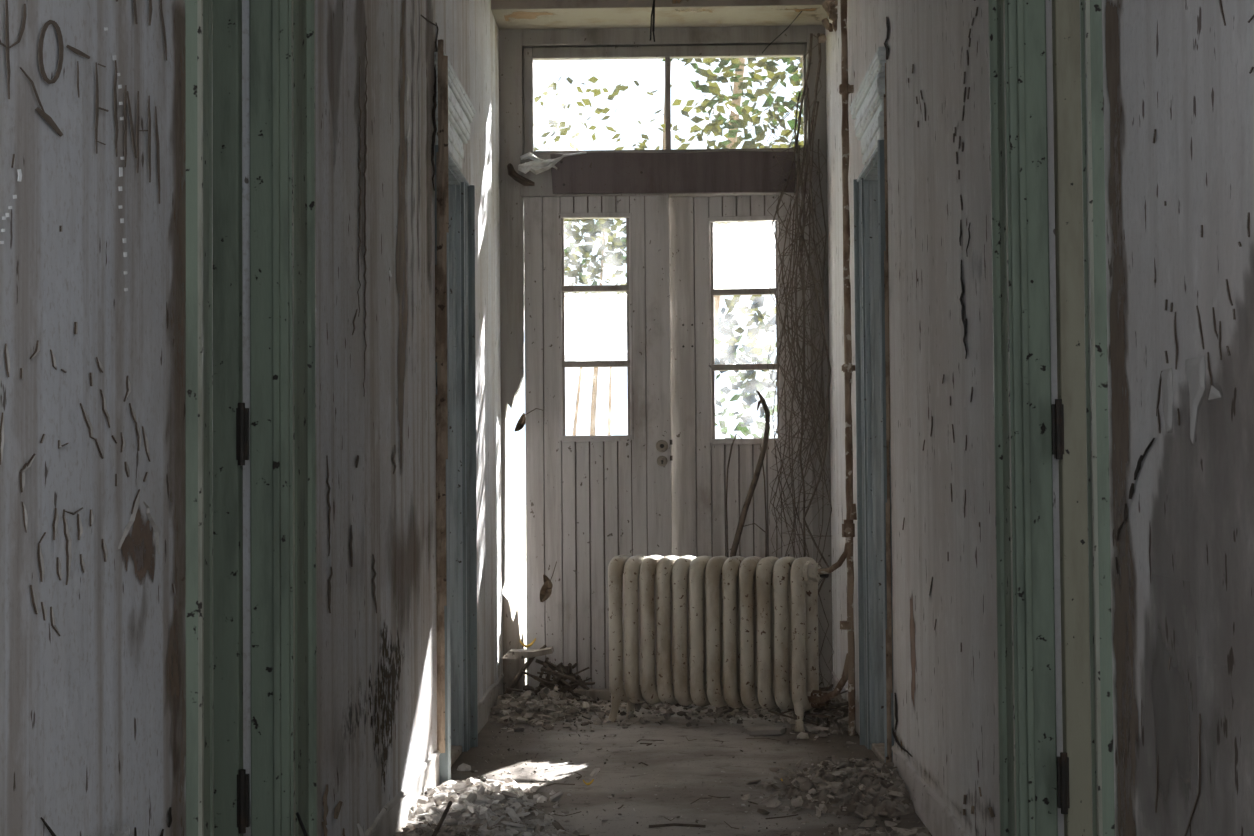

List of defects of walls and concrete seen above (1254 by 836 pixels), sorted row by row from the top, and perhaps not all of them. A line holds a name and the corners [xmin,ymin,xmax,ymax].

peeling [953,0,978,179]
peeling [4,340,67,379]
peeling [1156,279,1236,446]
peeling [20,434,69,533]
spalling [80,357,160,584]
peeling [30,507,94,636]